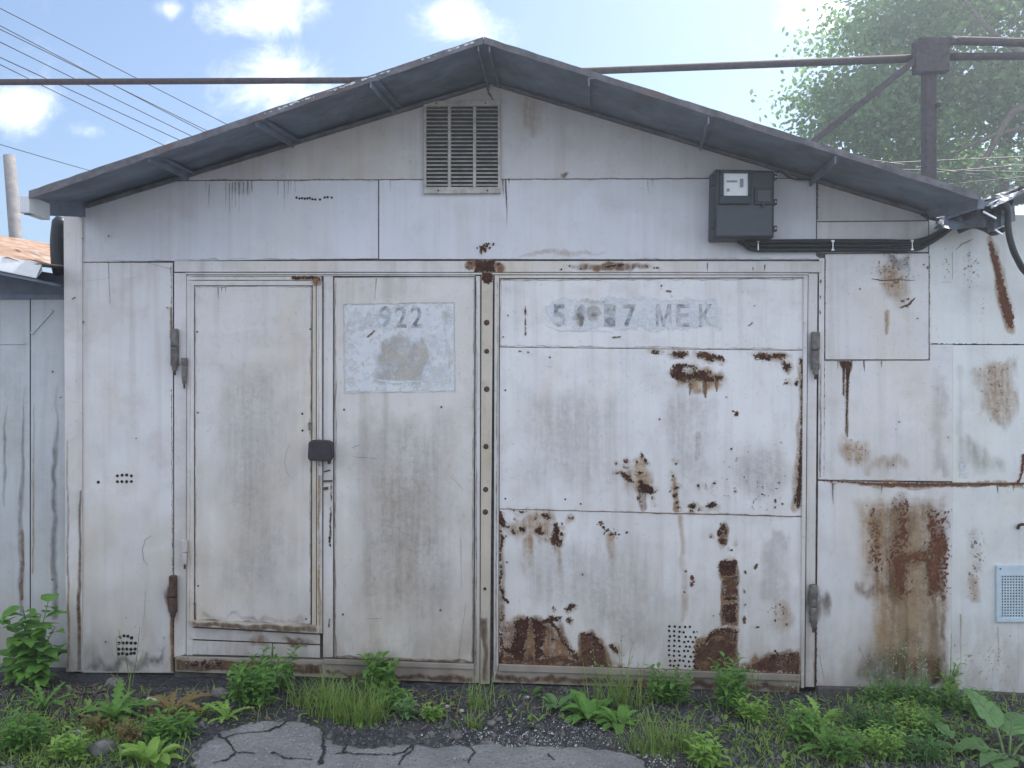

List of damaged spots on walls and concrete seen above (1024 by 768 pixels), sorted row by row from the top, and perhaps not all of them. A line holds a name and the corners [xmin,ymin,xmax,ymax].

corrosion [466,243,504,285]
corrosion [874,254,915,308]
corrosion [960,240,1015,332]
peeling [344,303,454,392]
corrosion [651,350,728,398]
corrosion [743,352,803,516]
leakage [20,525,34,600]
corrosion [395,509,660,686]
corrosion [615,448,800,693]
corrosion [822,454,1024,682]